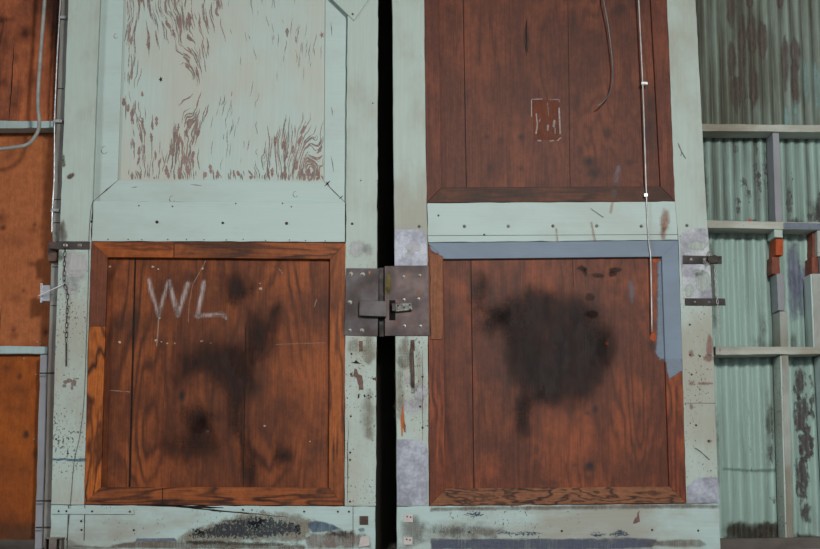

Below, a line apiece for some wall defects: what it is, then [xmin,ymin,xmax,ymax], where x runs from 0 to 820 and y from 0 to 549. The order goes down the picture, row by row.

peeling [122,0,324,182]
water stain [182,306,279,439]
water stain [485,291,607,429]
peeling [181,513,311,542]